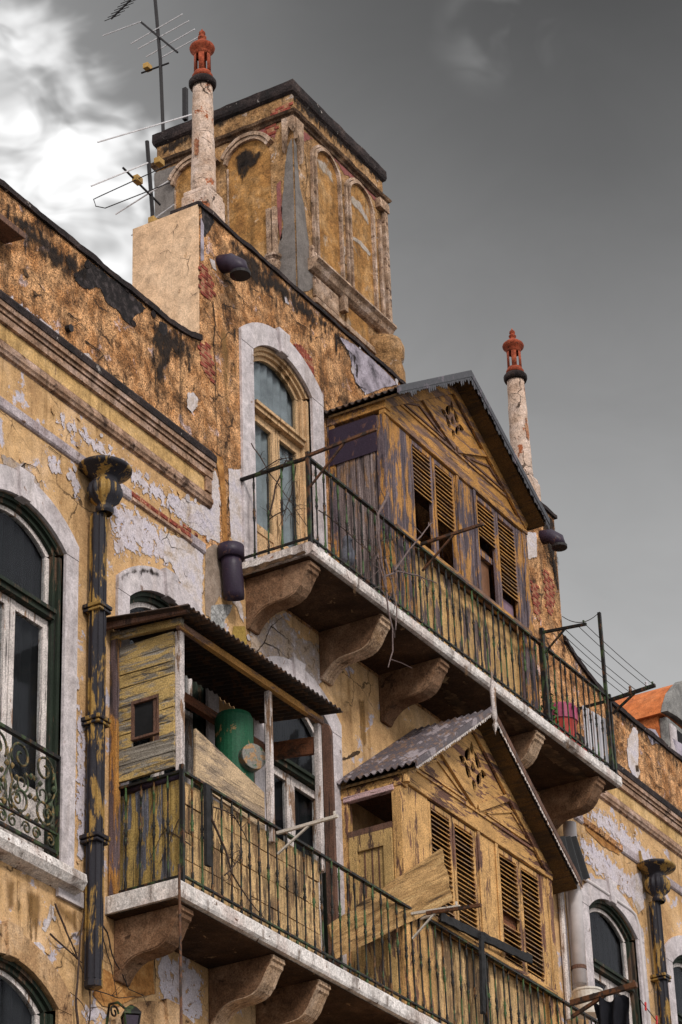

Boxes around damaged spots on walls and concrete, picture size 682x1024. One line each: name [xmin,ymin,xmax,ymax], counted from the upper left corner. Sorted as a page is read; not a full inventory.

peeling [341,338,398,395]
peeling [51,405,243,612]
peeling [577,807,655,914]
peeling [71,955,205,1024]